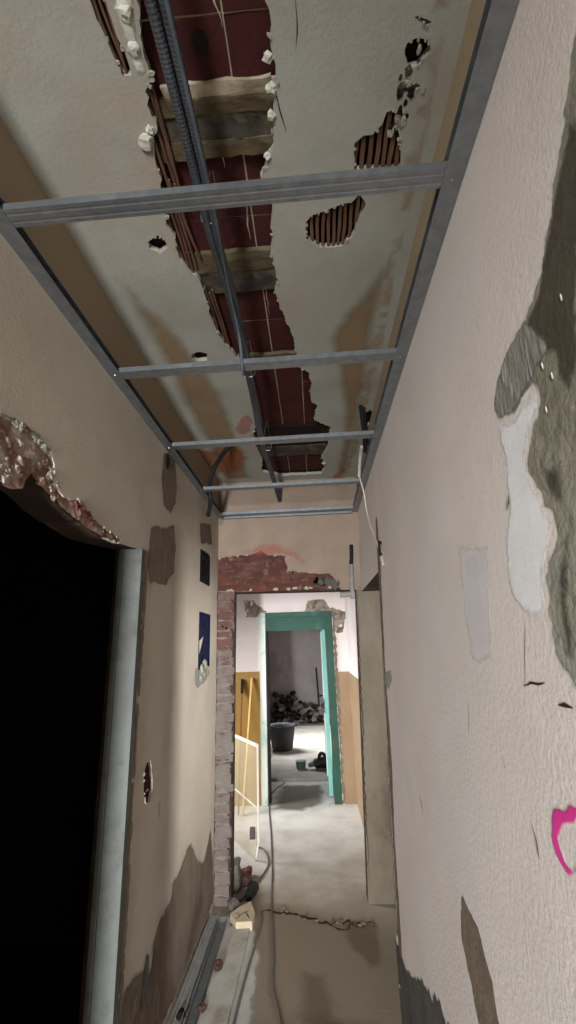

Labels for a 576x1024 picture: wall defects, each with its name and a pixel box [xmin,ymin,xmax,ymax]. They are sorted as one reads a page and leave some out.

spalling [92,0,130,74]
spalling [353,15,432,169]
spalling [149,236,178,251]
spalling [305,196,365,250]
peeling [512,36,576,686]
spalling [0,412,121,544]
spalling [144,762,152,804]
flaking render [213,551,346,907]
crack [261,517,402,1003]